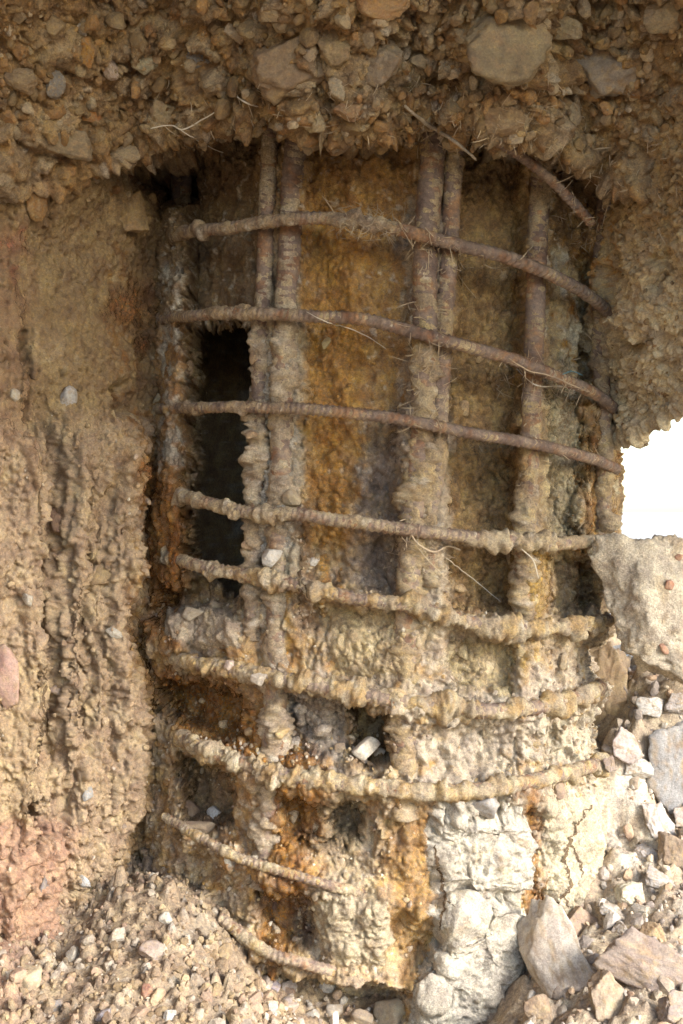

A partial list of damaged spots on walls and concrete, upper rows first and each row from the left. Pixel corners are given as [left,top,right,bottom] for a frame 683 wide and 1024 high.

rust [306,231,359,514]
spalling [448,142,529,531]
rust [129,455,322,770]
rust [310,522,344,588]
spalling [448,542,514,613]
spalling [447,637,516,698]
spalling [287,695,396,767]
spalling [178,758,235,829]
rust [258,783,321,950]
spalling [312,797,362,851]
rust [384,814,432,980]
crack [556,805,593,909]